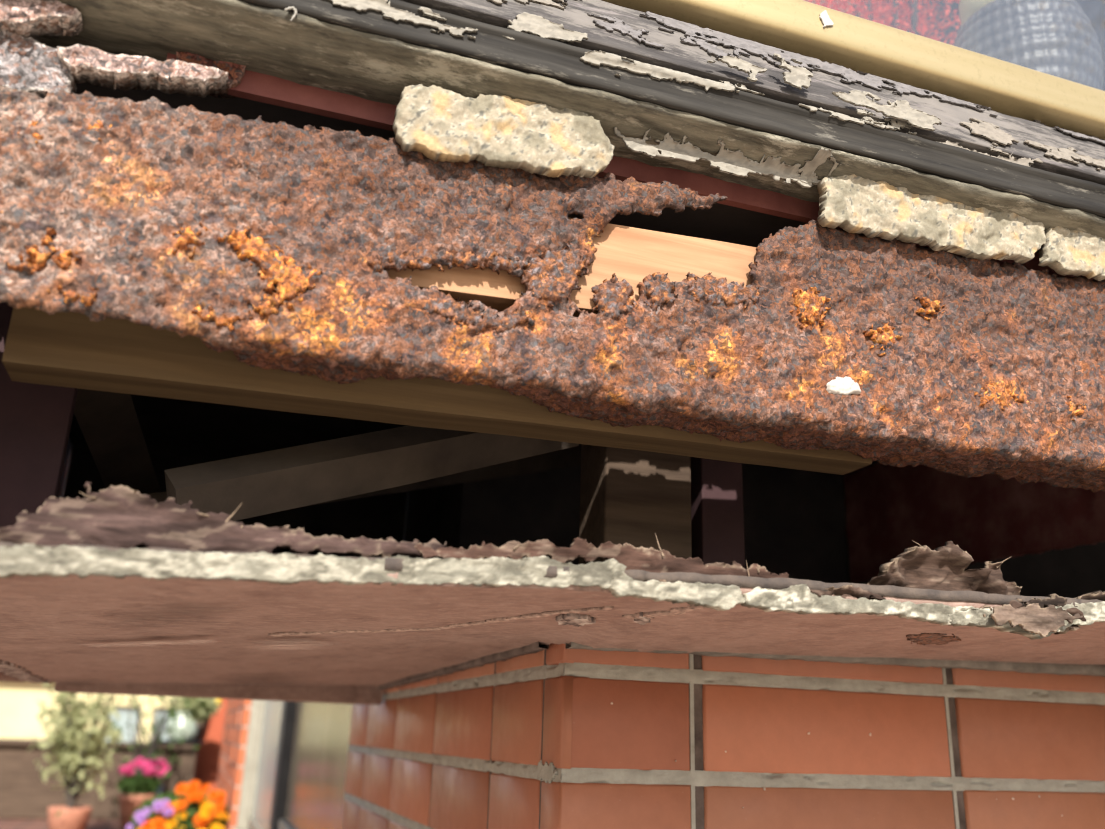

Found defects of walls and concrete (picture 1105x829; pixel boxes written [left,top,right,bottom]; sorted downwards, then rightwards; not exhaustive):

peeling [329,0,478,40]
peeling [57,44,228,97]
peeling [488,0,1105,171]
spalling [393,84,1105,281]
rust [5,227,83,280]
rust [172,222,322,332]
rust [367,244,760,335]
rust [789,287,831,329]
rust [914,293,946,321]
rust [863,323,903,357]
spalling [63,447,106,499]
spalling [0,463,1105,640]